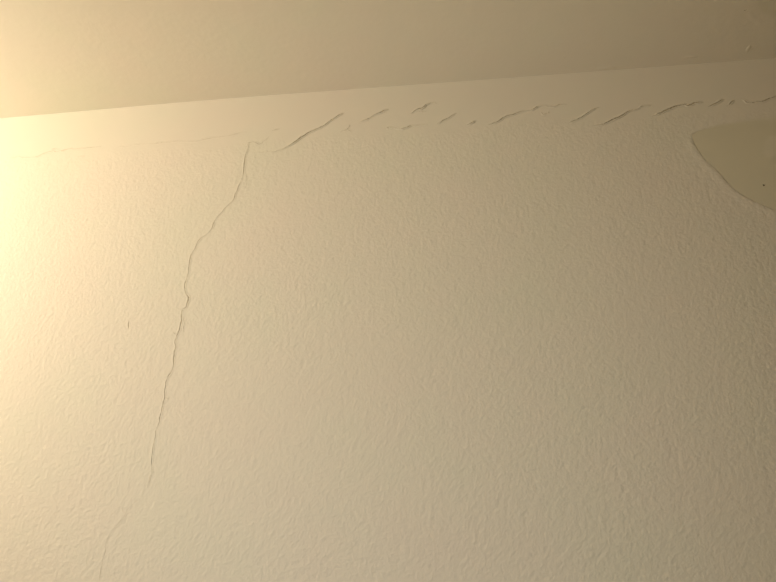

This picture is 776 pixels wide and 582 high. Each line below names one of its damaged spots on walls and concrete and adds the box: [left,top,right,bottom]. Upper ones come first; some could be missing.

crack [146,95,776,488]